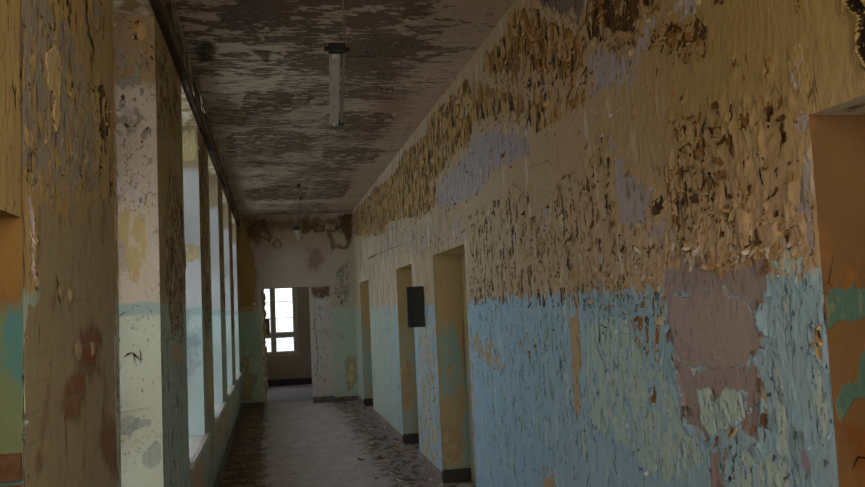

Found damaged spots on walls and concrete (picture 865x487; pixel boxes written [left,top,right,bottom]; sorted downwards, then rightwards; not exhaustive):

flaking render [0,0,235,487]
peeling [206,0,865,487]